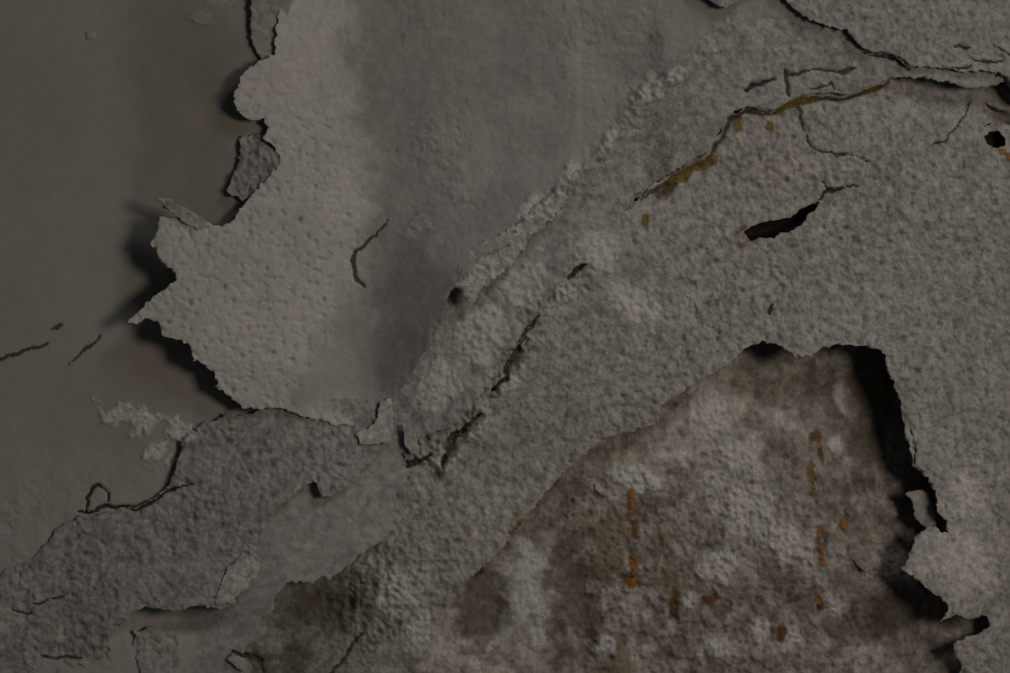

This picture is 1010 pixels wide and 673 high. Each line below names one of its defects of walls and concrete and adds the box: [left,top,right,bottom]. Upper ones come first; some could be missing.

crack [946,44,1010,71]
crack [640,51,910,201]
corrosion [767,96,819,132]
corrosion [656,154,717,199]
crack [350,219,388,288]
crack [567,263,587,279]
crack [402,315,540,469]
peeling [176,77,1010,673]
corrosion [807,430,824,496]
crack [77,483,194,514]
peeling [0,397,396,673]
corrosion [777,625,787,642]